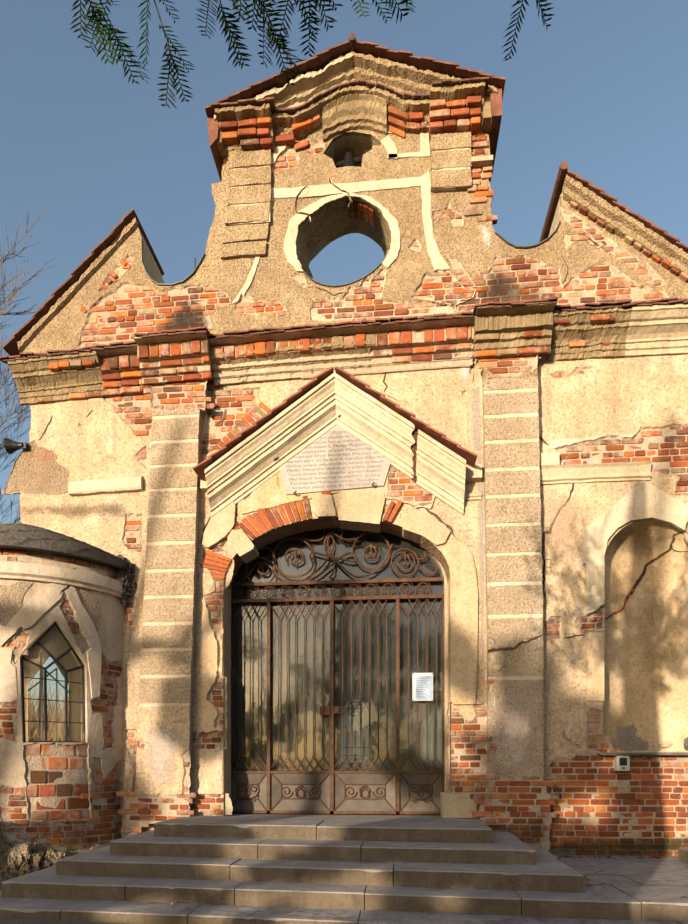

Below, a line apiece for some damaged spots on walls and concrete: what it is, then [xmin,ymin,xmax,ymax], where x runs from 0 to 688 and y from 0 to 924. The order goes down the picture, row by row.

crack [294,186,311,222]
spalling [432,201,464,228]
spalling [76,254,288,347]
spalling [310,207,669,323]
spalling [2,440,71,495]
crack [410,428,418,482]
spalling [555,423,688,496]
crack [425,508,455,536]
crack [541,461,574,599]
crack [488,521,688,653]
spalling [0,545,235,851]
spalling [446,679,688,856]